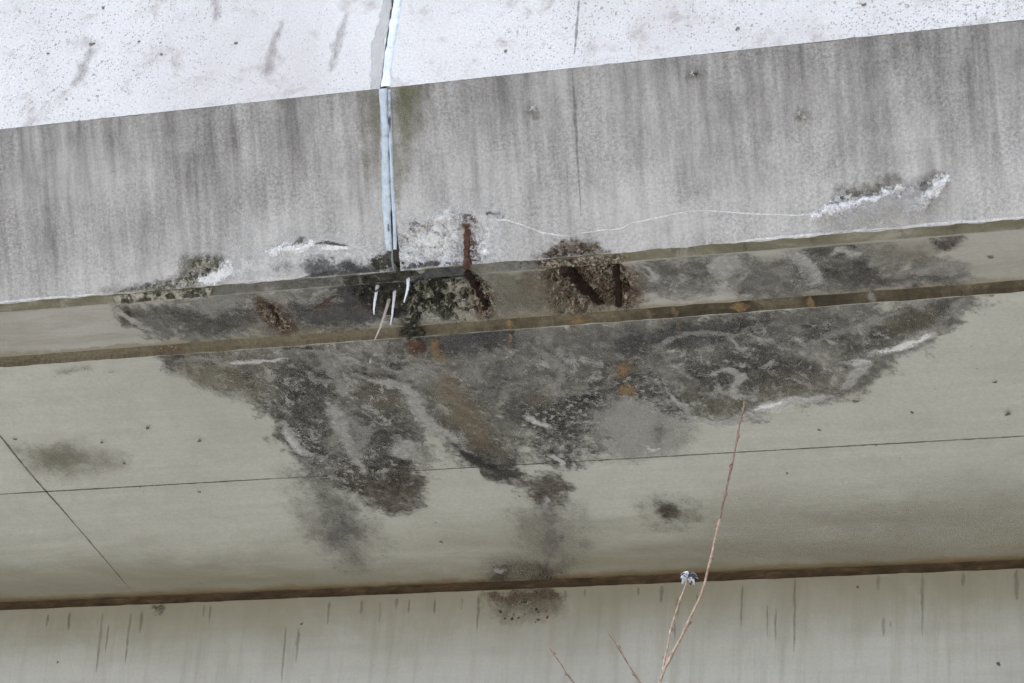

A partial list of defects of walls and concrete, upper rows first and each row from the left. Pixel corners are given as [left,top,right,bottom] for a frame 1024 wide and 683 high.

crack [486,210,806,236]
leakage [0,293,104,303]
spalling [113,256,252,304]
corrosion [254,297,297,335]
spalling [399,206,639,338]
leakage [112,216,1024,582]